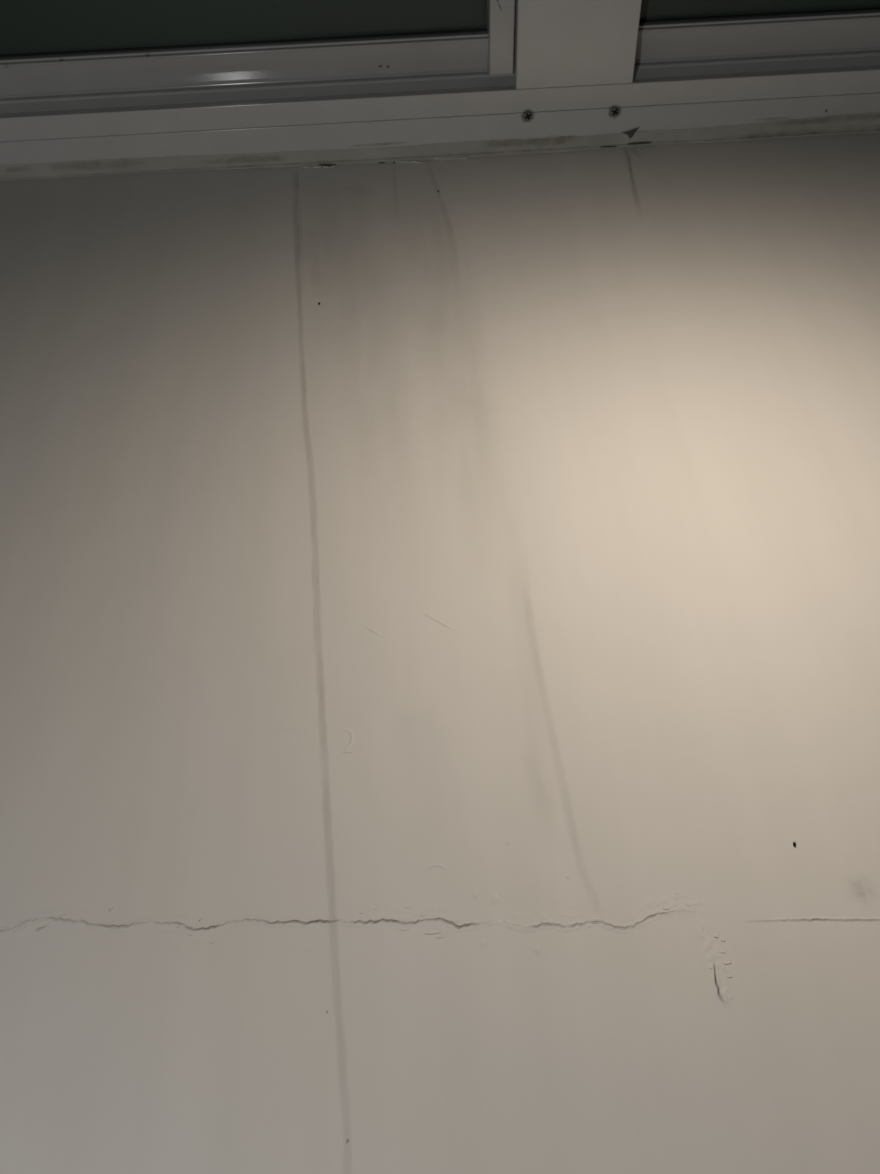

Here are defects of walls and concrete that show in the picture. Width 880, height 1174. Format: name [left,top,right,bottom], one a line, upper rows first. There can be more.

crack [0,904,694,943]
crack [742,915,880,923]